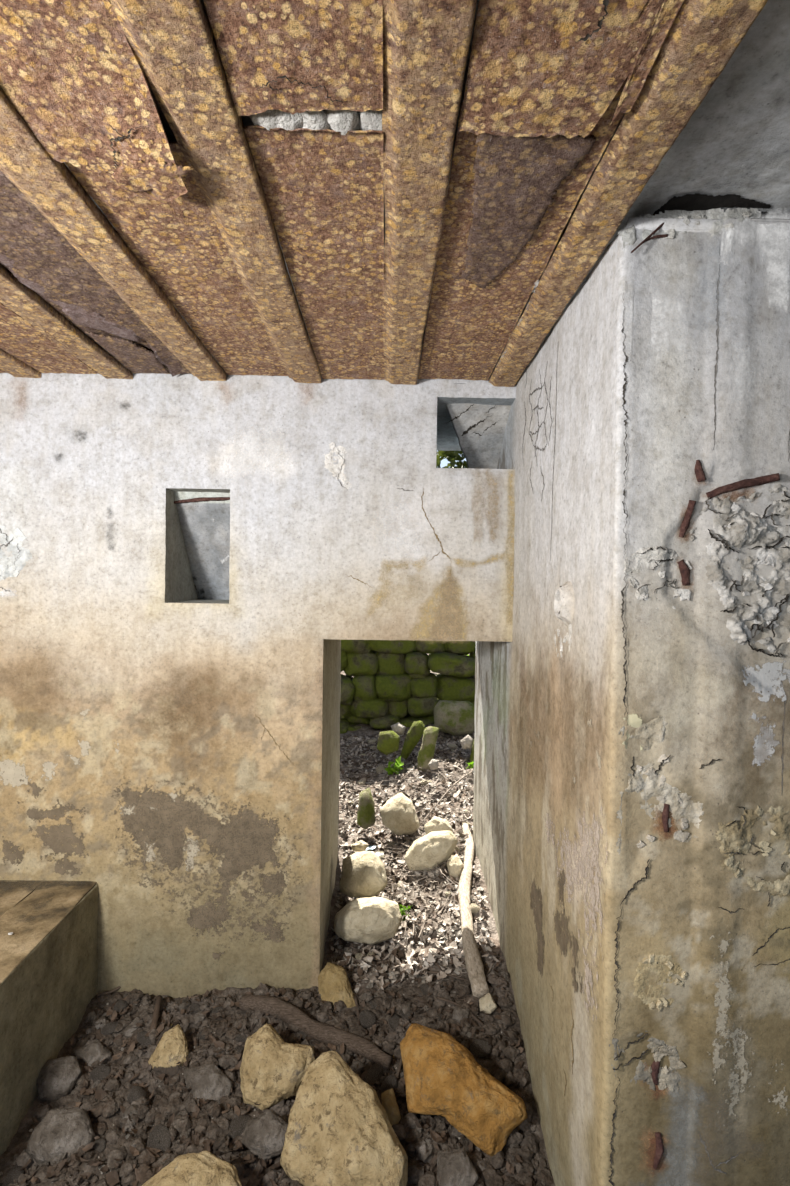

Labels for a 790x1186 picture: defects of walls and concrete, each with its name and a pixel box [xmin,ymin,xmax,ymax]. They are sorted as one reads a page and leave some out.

flaking render [0,525,32,596]
crack [397,488,451,573]
crack [449,351,558,559]
crack [620,285,628,731]
spalling [624,460,790,766]
crack [612,905,622,1036]
crack [609,1079,620,1186]